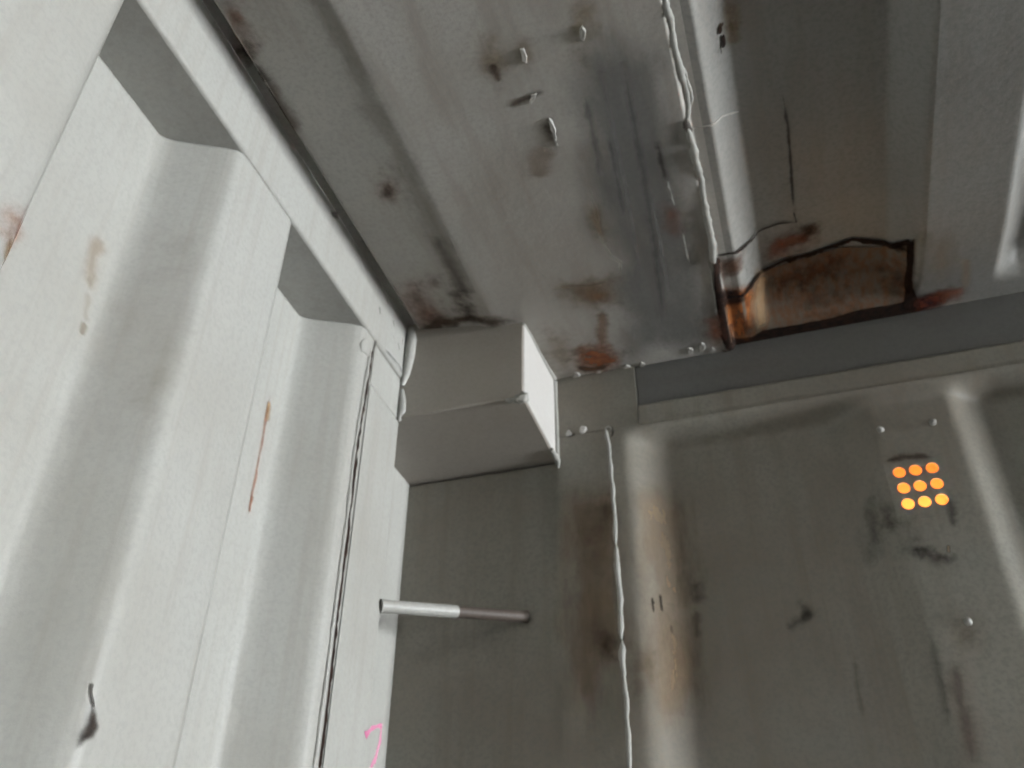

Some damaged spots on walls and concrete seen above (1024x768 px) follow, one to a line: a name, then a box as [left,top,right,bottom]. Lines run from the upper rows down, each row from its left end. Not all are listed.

rust [415,292,505,329]
rust [714,240,963,352]
rust [578,314,618,371]